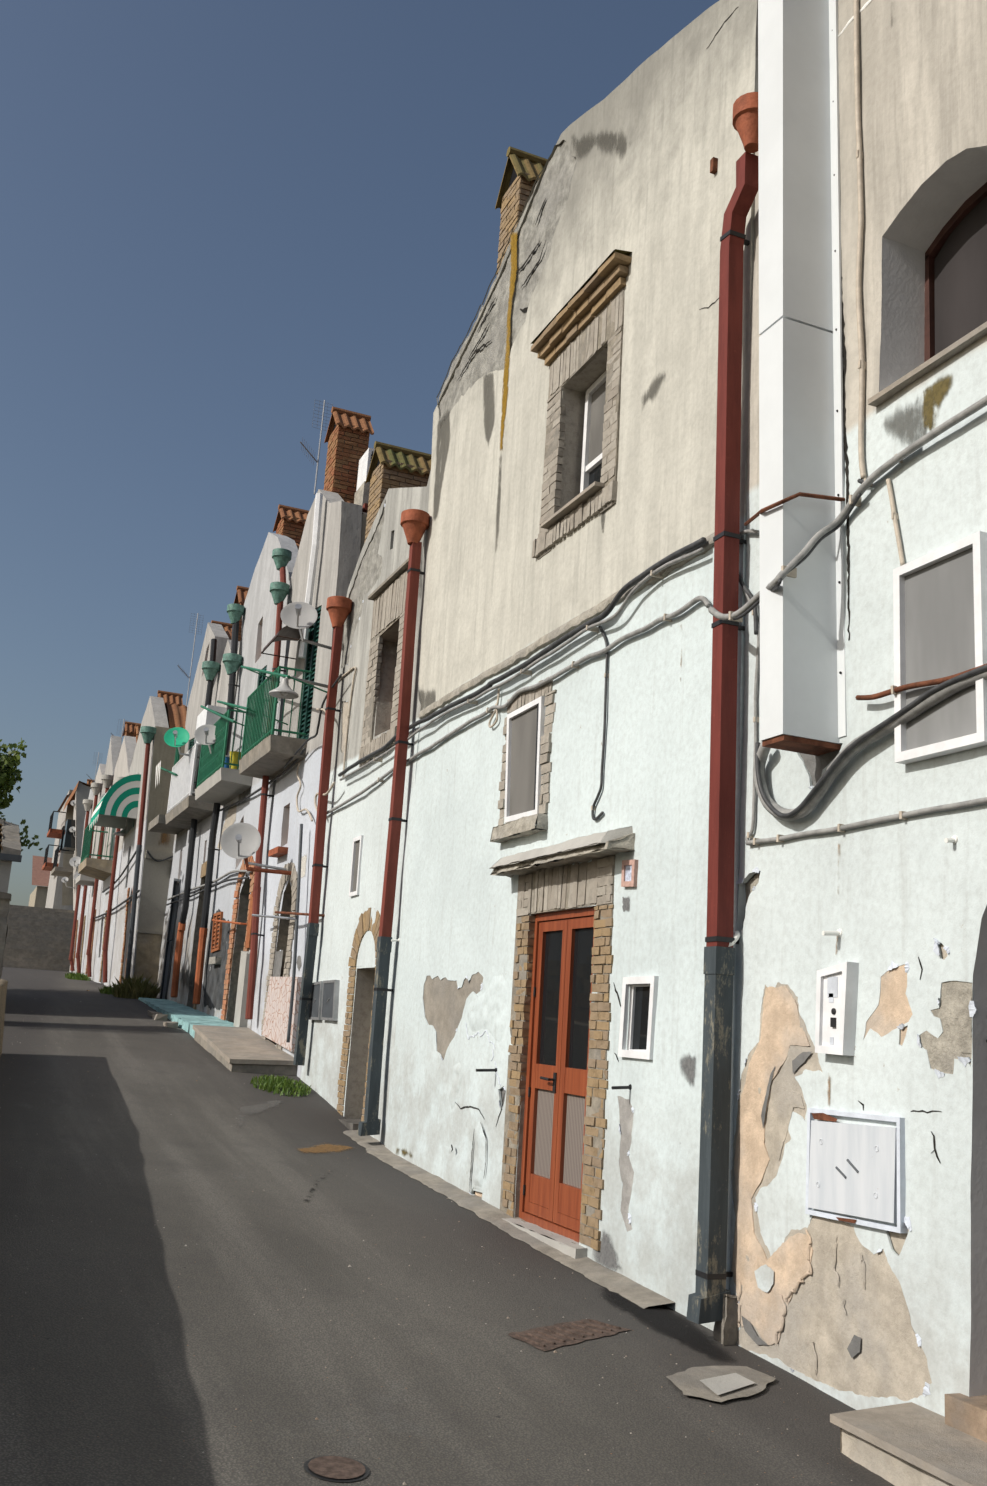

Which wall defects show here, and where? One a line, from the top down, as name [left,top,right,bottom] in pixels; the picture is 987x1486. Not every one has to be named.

flaking render [933,938,950,959]
flaking render [423,972,506,1107]
flaking render [864,961,977,1079]
flaking render [731,982,932,1401]